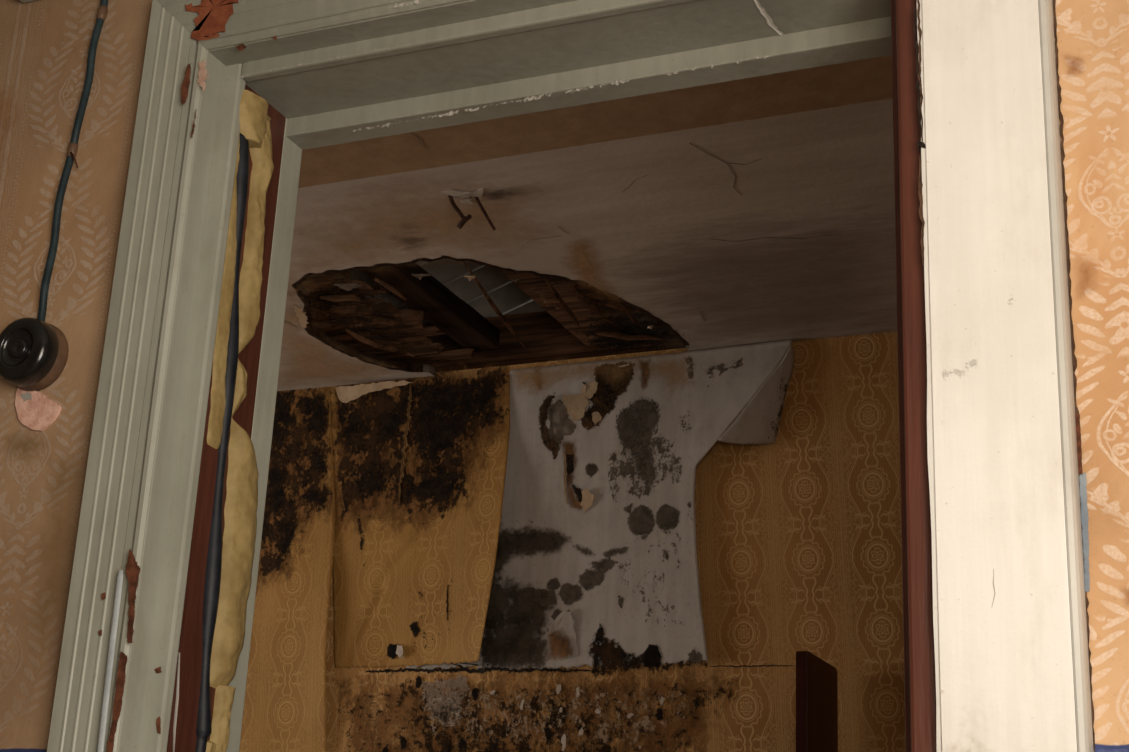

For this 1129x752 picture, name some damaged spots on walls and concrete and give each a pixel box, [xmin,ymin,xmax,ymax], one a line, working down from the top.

peeling [185,0,239,41]
peeling [293,304,308,329]
spalling [563,361,635,430]
water stain [707,358,743,387]
water stain [258,337,581,582]
water stain [309,243,732,752]
peeling [97,549,140,752]